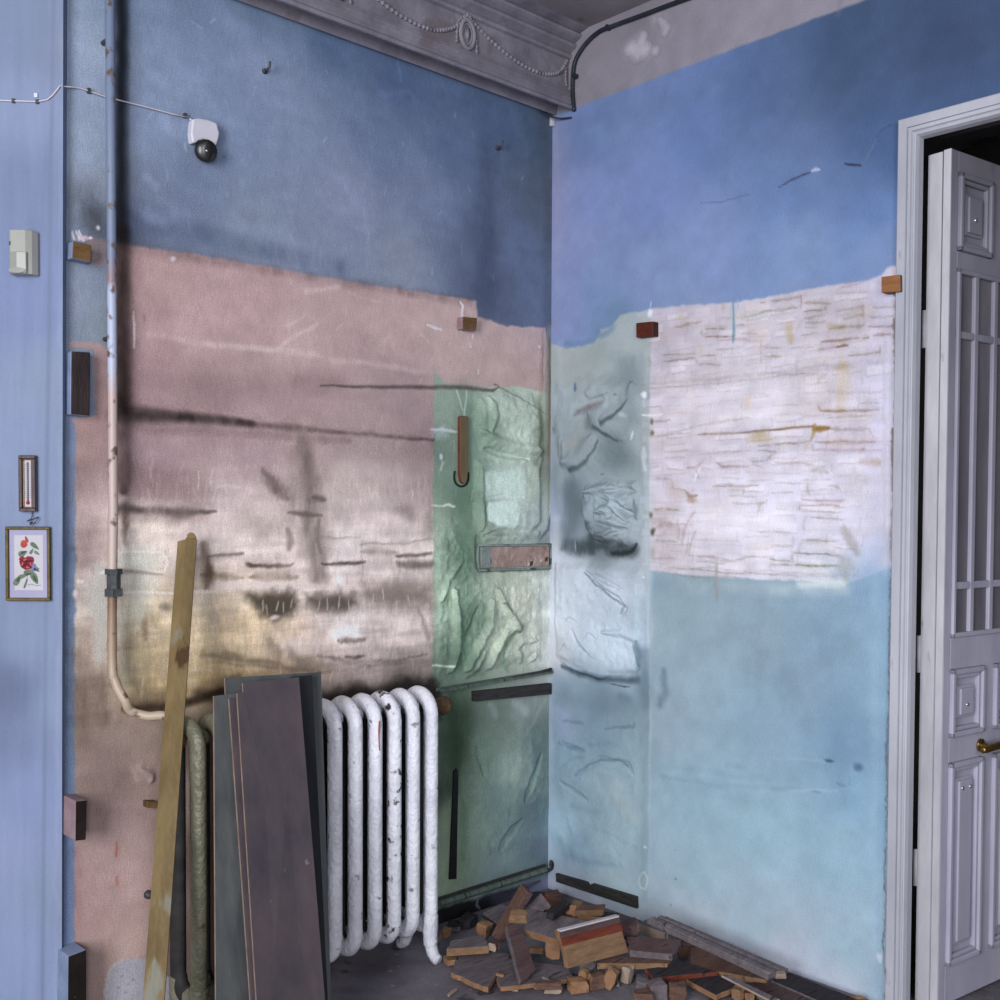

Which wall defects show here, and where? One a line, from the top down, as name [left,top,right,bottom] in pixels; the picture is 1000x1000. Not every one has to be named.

crack [778,122,898,188]
damp [118,419,186,454]
damp [538,278,895,586]
damp [117,499,178,694]
damp [193,550,331,595]
damp [223,418,458,676]
damp [451,614,493,680]
damp [495,600,526,675]